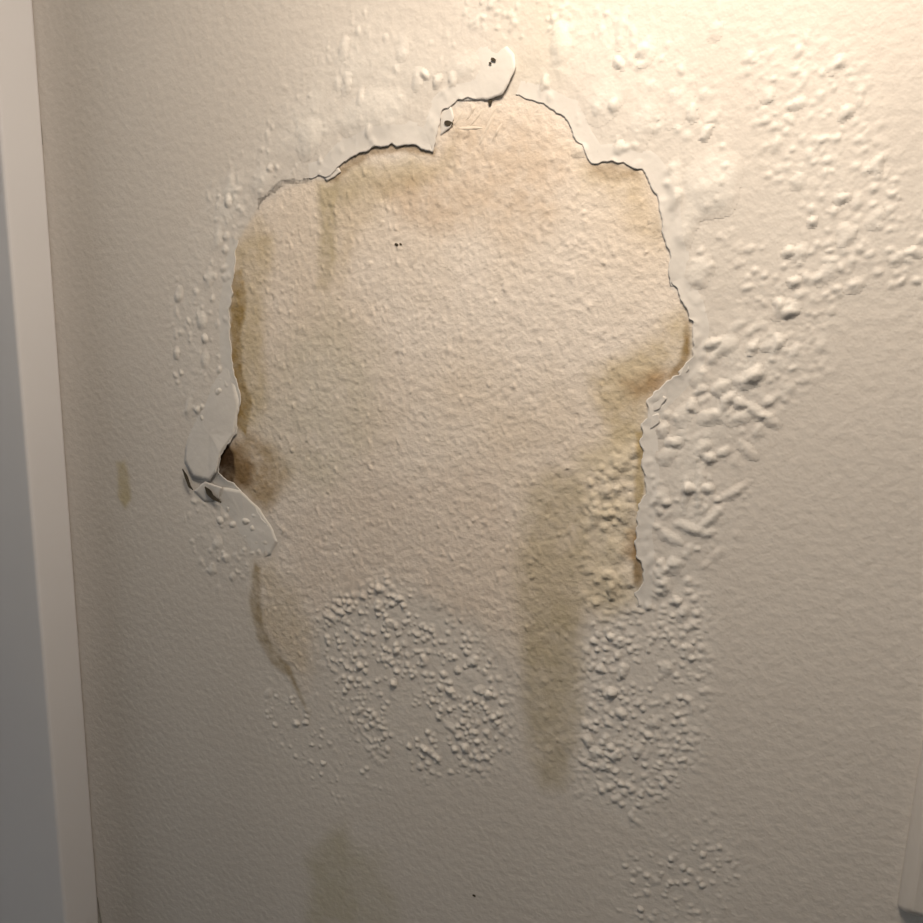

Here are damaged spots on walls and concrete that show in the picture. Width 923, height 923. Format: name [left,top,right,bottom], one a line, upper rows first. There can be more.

peeling [184,238,278,557]
water stain [219,0,694,798]
peeling [257,46,709,611]